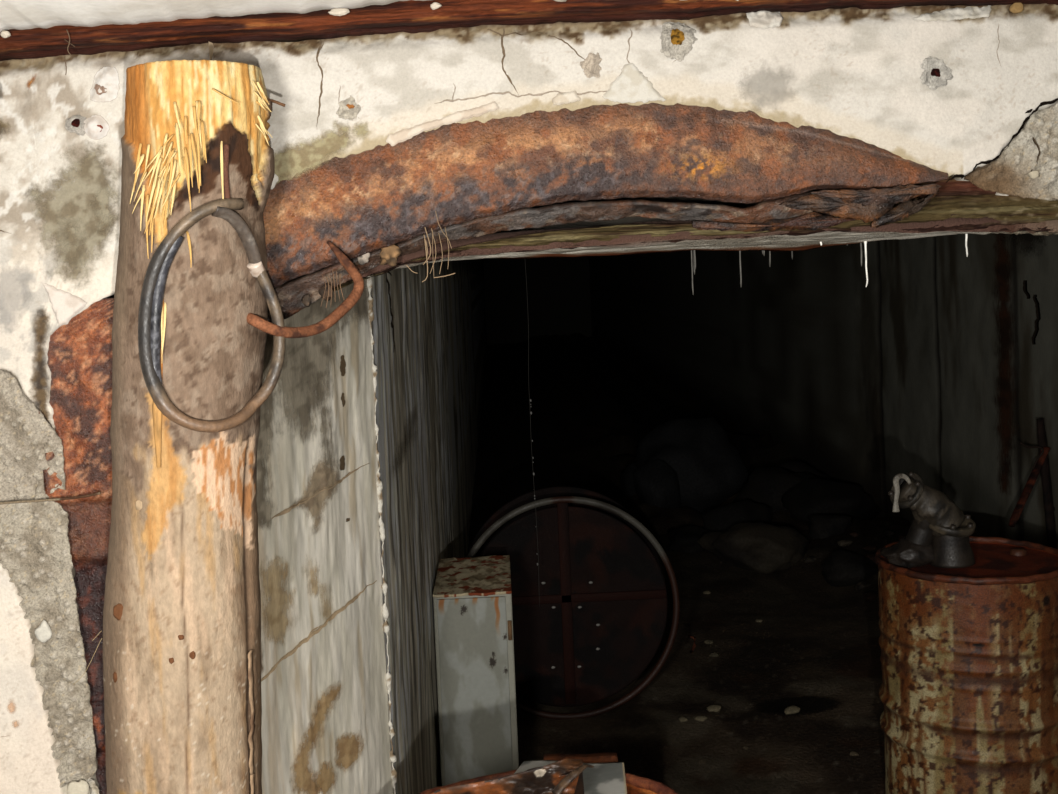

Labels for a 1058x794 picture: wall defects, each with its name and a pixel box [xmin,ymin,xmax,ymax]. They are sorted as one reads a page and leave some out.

spalling [1009,3,1024,14]
spalling [964,102,1058,201]
water stain [28,148,118,279]
rust [692,184,942,232]
water stain [1010,233,1045,253]
water stain [31,310,51,426]
flaking render [0,369,99,794]
water stain [263,558,292,641]
water stain [310,569,331,618]
water stain [294,684,364,794]